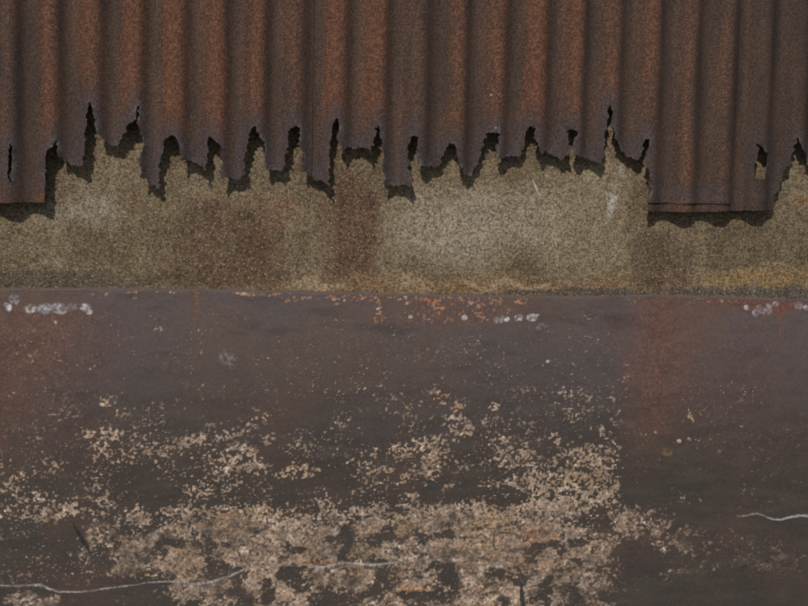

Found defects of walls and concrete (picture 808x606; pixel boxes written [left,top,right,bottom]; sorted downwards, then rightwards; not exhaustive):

leakage [0,157,707,325]
efflorescence [491,313,549,331]
peeling [0,292,745,606]
crack [736,512,808,521]
crack [0,566,248,594]